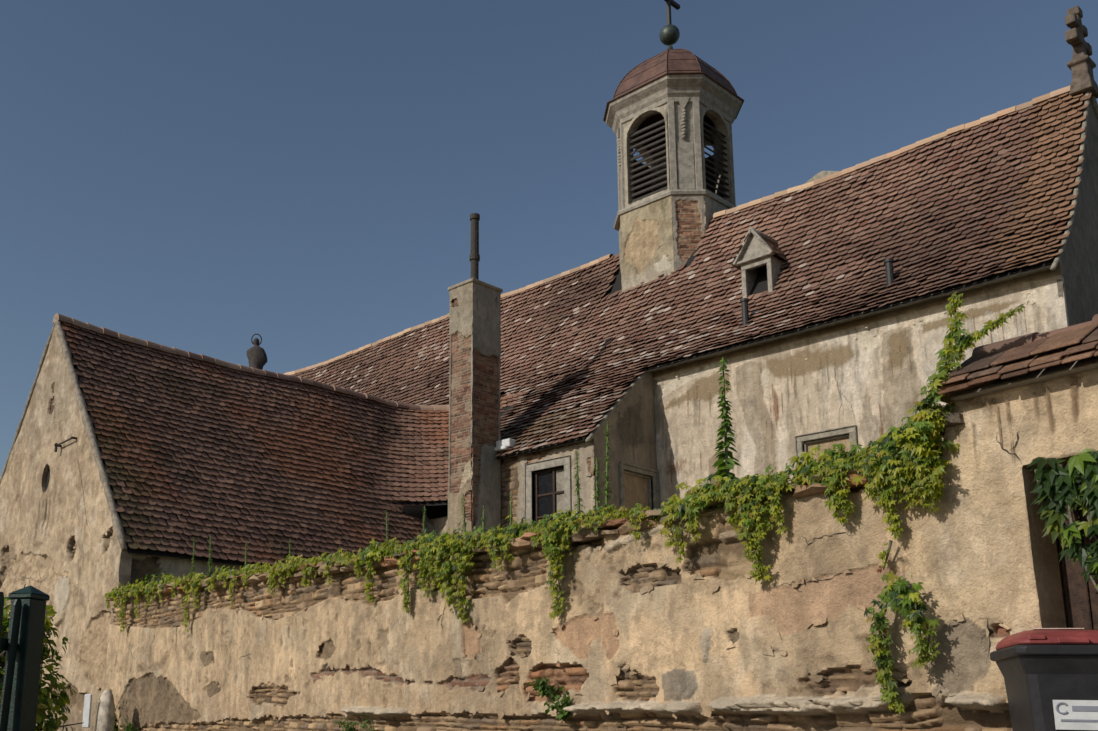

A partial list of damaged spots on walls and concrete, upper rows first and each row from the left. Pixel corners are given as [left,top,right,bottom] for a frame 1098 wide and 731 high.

spalling [449,330,501,526]
damp [1070,377,1078,420]
spalling [501,443,576,530]
spalling [103,527,113,550]
spalling [619,513,755,594]
spalling [49,539,606,710]
spalling [117,611,1013,731]